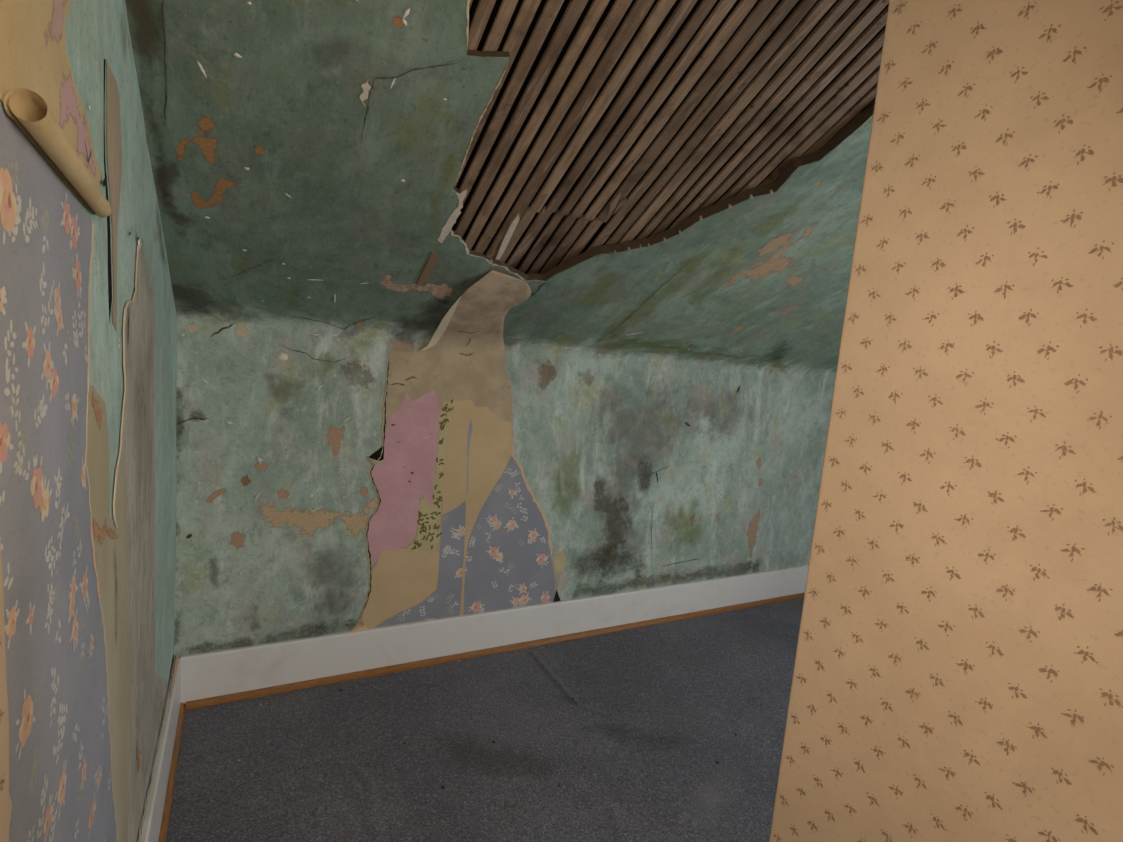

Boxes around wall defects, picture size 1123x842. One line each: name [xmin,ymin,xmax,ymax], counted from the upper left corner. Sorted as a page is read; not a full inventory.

peeling [175,114,238,219]
flaking render [438,63,836,287]
peeling [380,274,455,300]
spalling [366,434,384,465]
flaking render [86,244,168,842]
peeling [259,487,379,536]